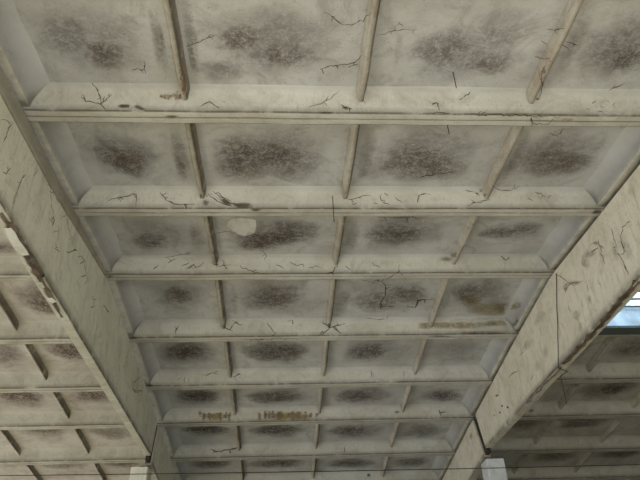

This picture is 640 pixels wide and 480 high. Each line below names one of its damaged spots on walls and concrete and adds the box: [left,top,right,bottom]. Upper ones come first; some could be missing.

crack [81,83,112,110]
spalling [0,213,64,318]
peeling [227,218,256,236]
crack [153,253,431,320]
crack [593,222,628,272]